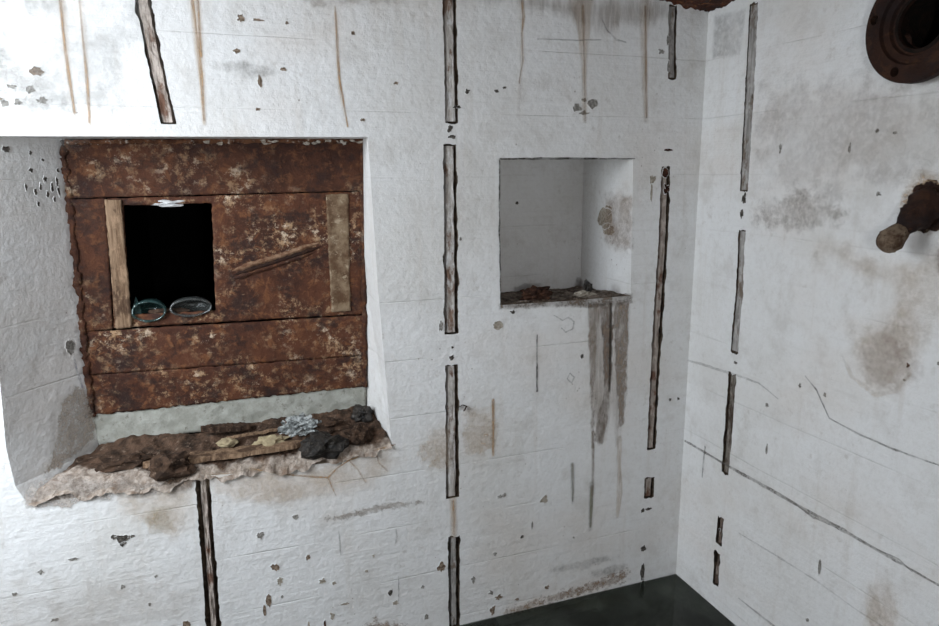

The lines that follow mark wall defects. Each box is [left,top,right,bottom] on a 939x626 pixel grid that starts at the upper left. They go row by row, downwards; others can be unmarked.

spalling [649,167,670,201]
rust [59,139,96,418]
rust [359,143,368,388]
water stain [500,295,631,426]
peeling [26,385,121,508]
crack [685,440,939,586]